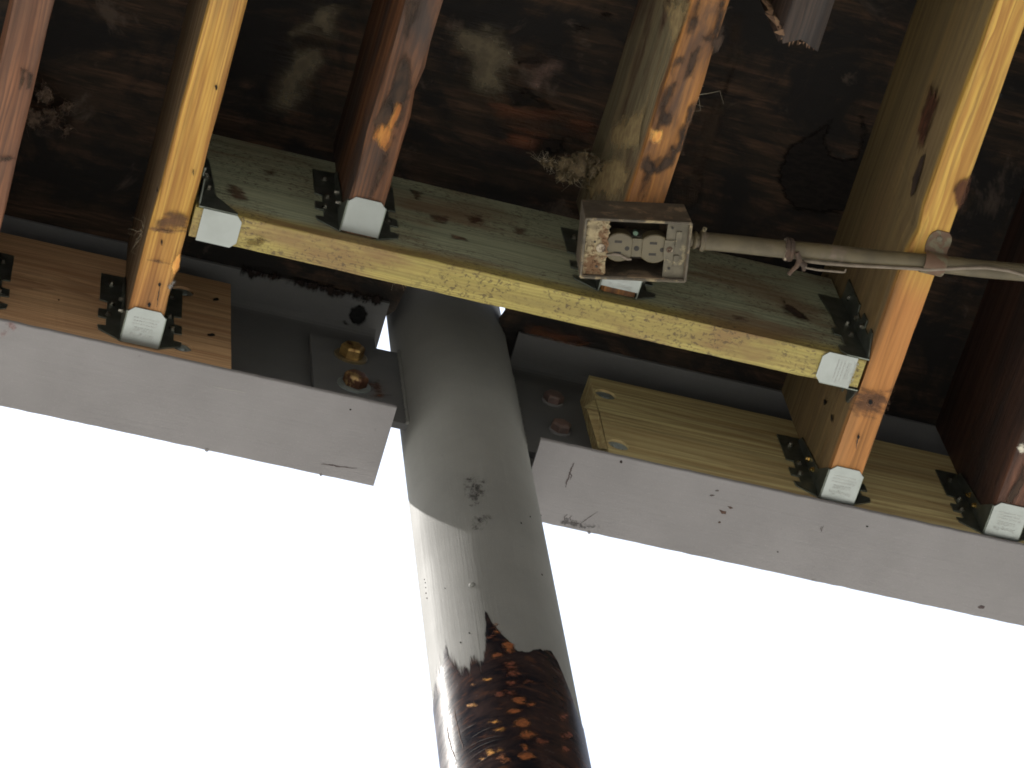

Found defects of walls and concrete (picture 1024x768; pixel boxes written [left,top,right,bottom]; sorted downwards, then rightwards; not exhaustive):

water stain [641,0,725,191]
peeling [433,612,591,768]